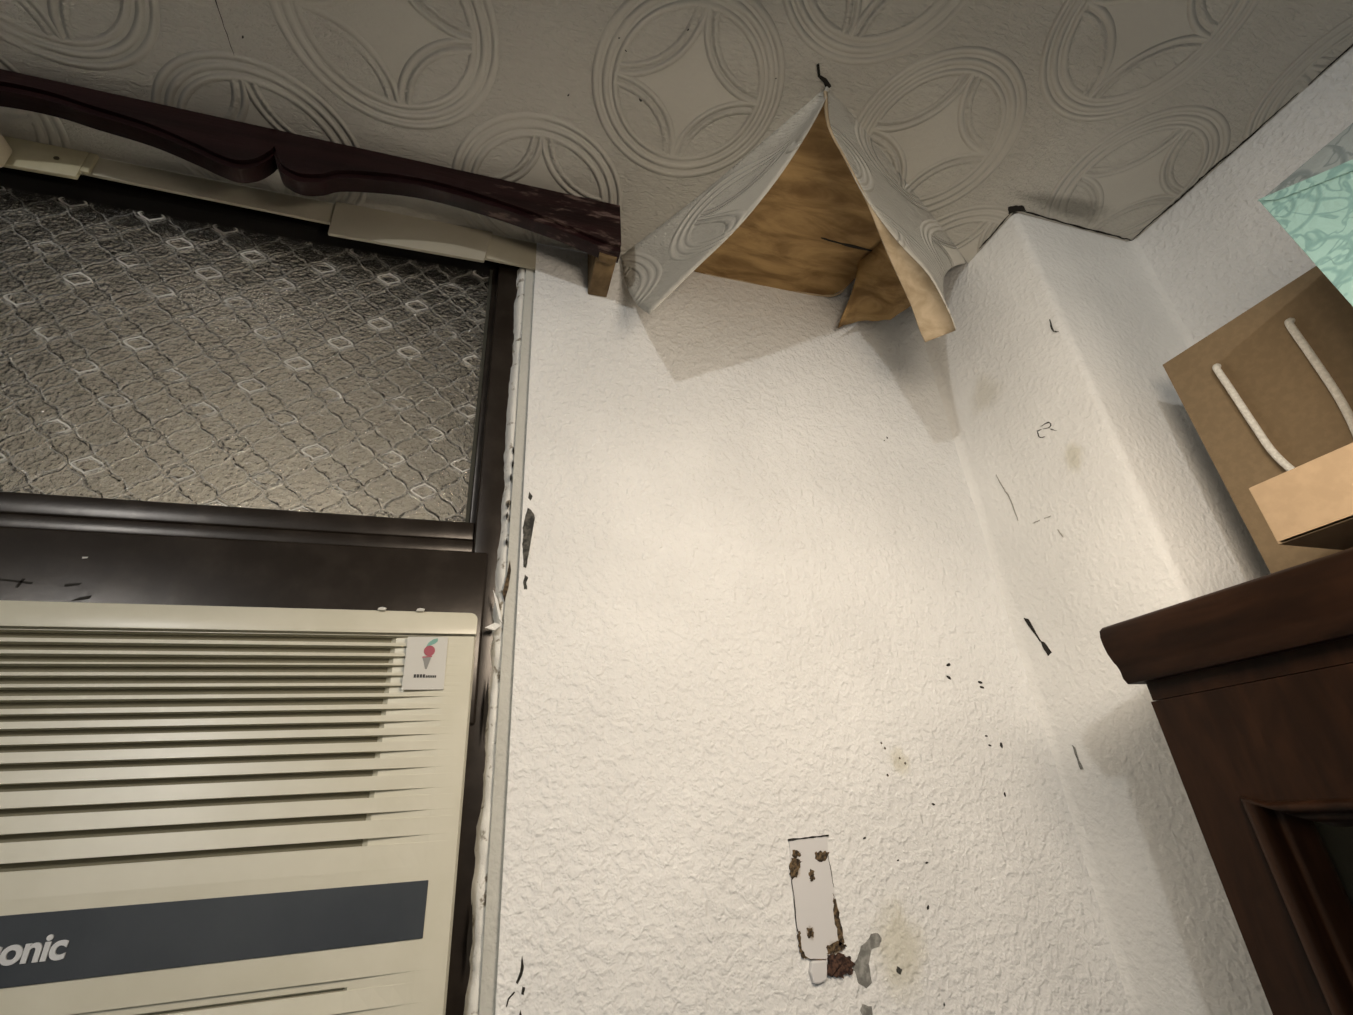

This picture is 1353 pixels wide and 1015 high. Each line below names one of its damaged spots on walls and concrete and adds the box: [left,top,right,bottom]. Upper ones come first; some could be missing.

peeling [621,64,966,342]
spalling [522,492,536,589]
corrosion [788,835,829,882]
corrosion [797,927,814,959]
corrosion [826,894,855,979]